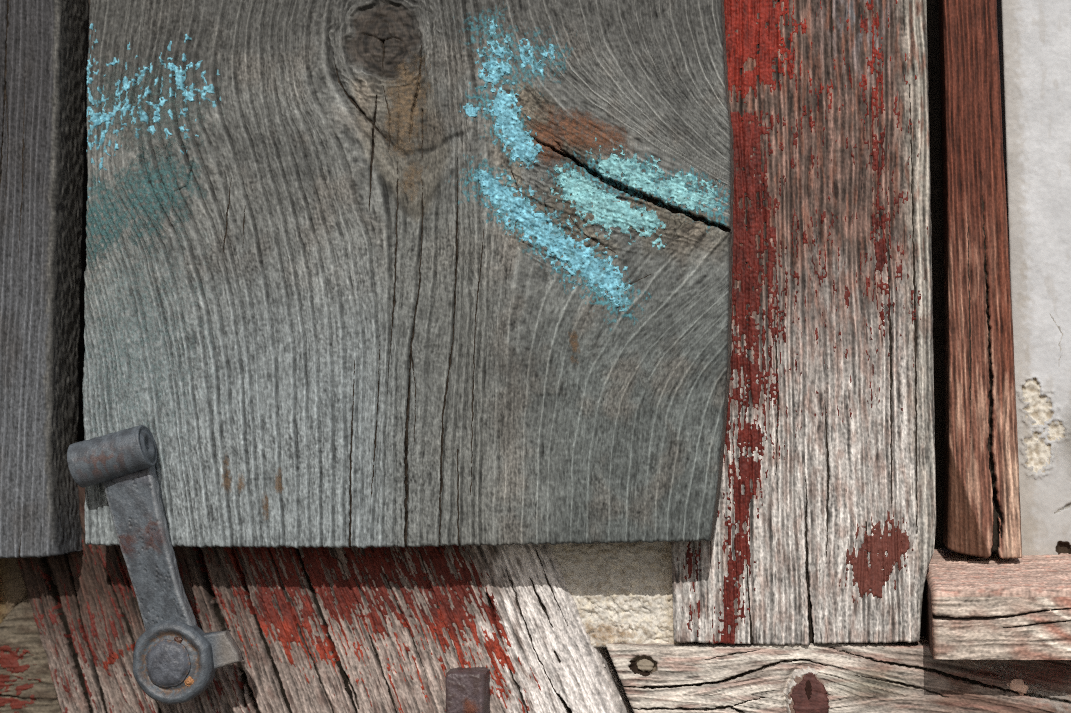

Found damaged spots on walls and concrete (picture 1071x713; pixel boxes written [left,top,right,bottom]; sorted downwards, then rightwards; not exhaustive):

peeling [86,23,222,199]
crack [534,138,732,234]
peeling [459,0,925,644]
crack [772,316,780,476]
crack [1050,314,1063,360]
peeling [0,540,156,713]
peeling [178,545,541,713]
crack [623,405,1071,713]